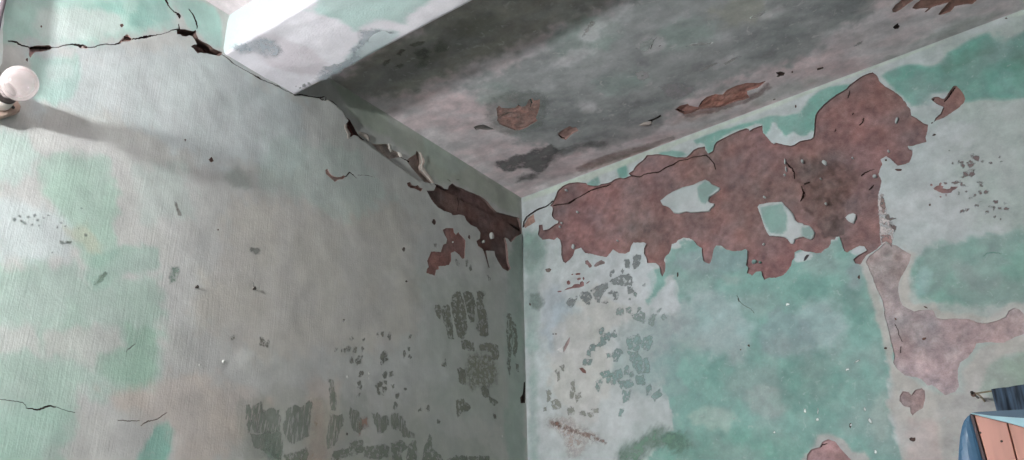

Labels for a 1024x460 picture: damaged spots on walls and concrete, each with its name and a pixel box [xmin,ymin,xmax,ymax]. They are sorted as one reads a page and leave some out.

crack [8,0,198,50]
spalling [892,0,976,29]
spalling [344,71,1024,419]
crack [0,399,75,413]
peeling [246,401,313,460]
peeling [327,332,489,460]
spalling [807,439,851,460]